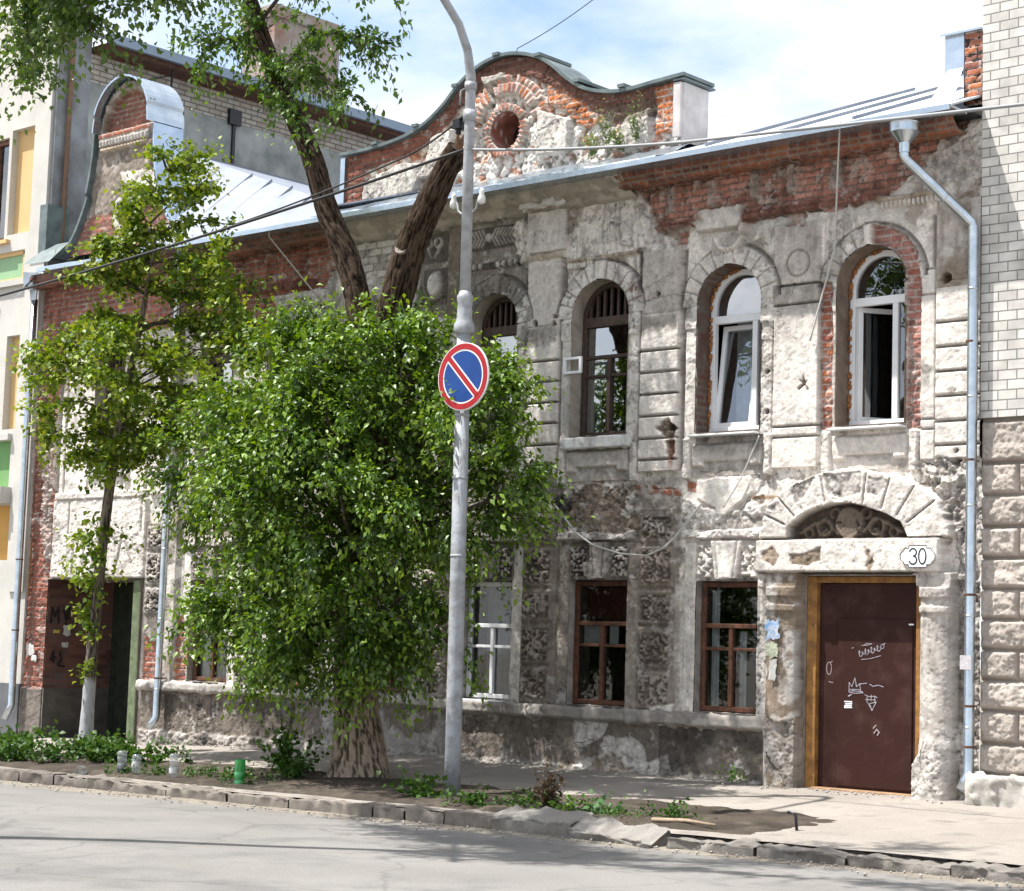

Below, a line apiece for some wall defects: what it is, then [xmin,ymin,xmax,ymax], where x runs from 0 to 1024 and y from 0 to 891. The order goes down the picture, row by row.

flaking render [579,120,982,251]
flaking render [822,281,835,430]
flaking render [873,224,923,430]
flaking render [22,286,70,689]